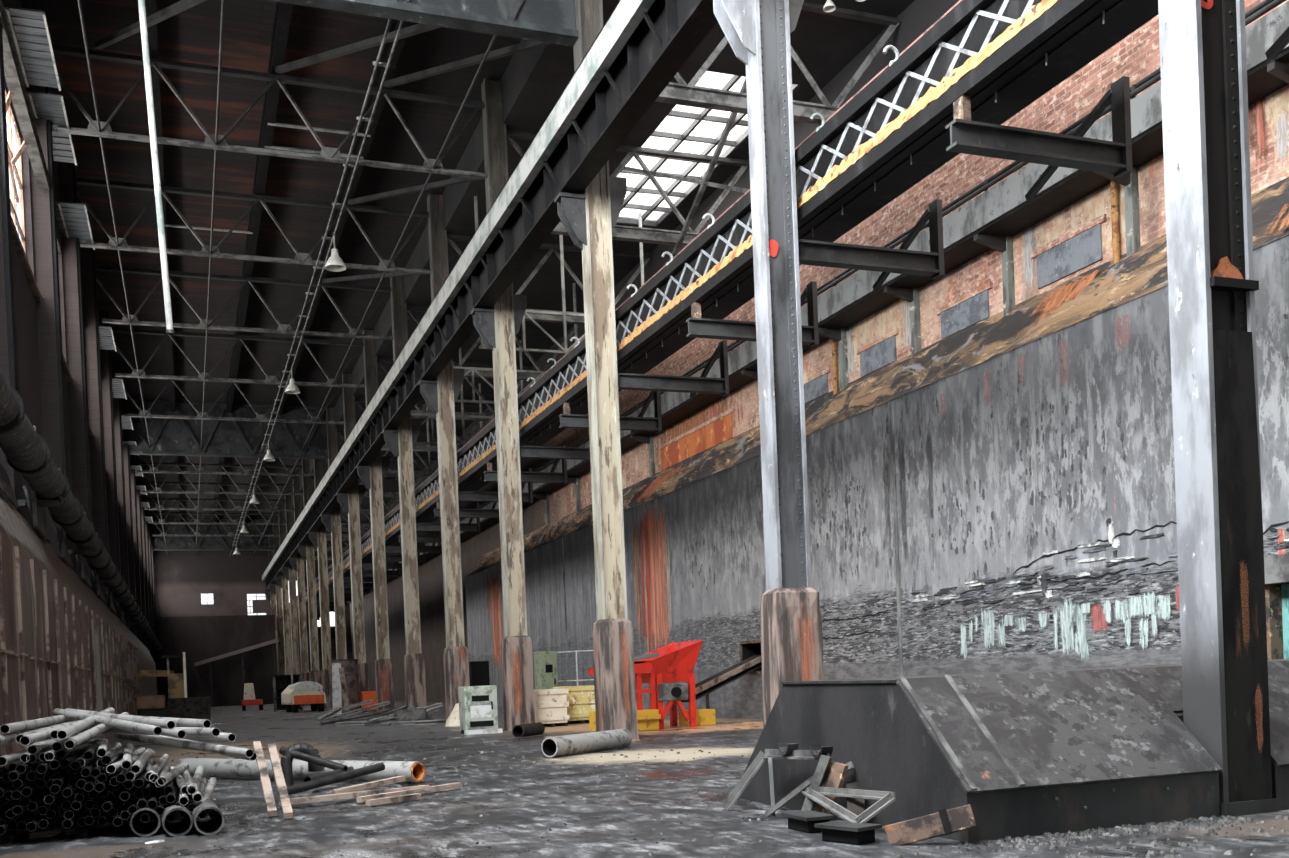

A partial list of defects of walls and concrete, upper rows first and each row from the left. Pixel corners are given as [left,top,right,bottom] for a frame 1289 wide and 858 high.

rust [1269,204,1289,233]
rust [1023,270,1104,336]
rust [657,396,743,448]
spalling [1266,527,1289,549]
rust [622,461,688,714]
peeling [911,518,1180,659]
rust [1241,565,1249,642]
rust [798,611,816,681]